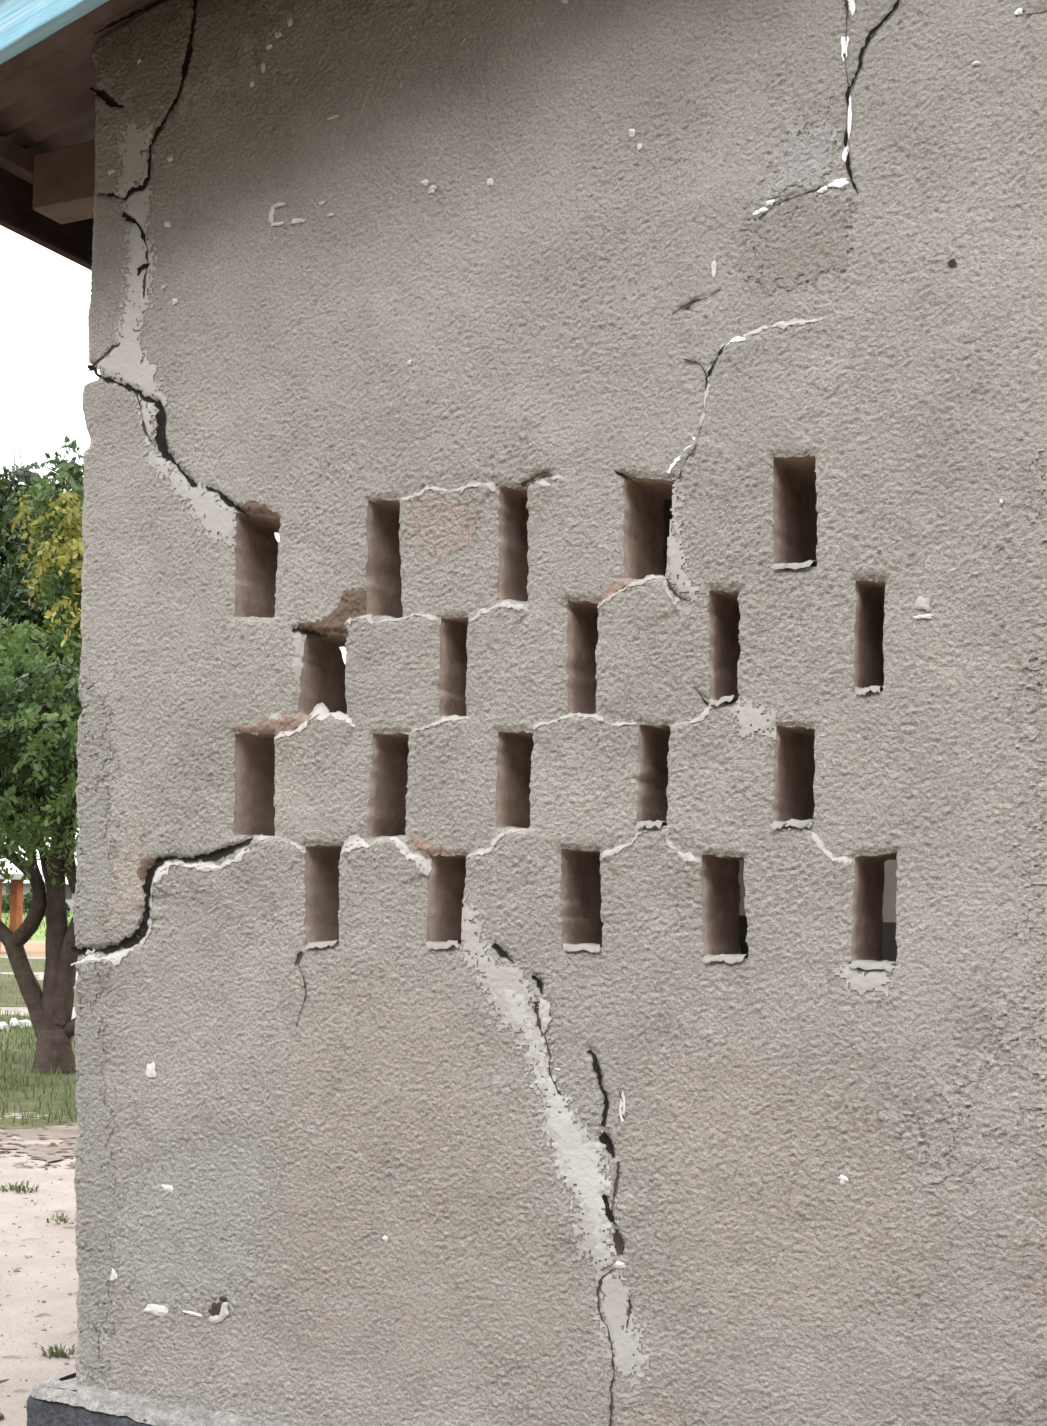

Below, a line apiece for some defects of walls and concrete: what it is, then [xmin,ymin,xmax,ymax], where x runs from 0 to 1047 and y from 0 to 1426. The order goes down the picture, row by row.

crack [90,0,197,298]
crack [759,0,899,219]
crack [672,289,720,315]
crack [87,342,250,519]
crack [521,472,553,487]
crack [292,627,327,640]
crack [666,579,689,601]
crack [71,838,253,956]
crack [491,942,561,1095]
crack [587,1049,632,1426]